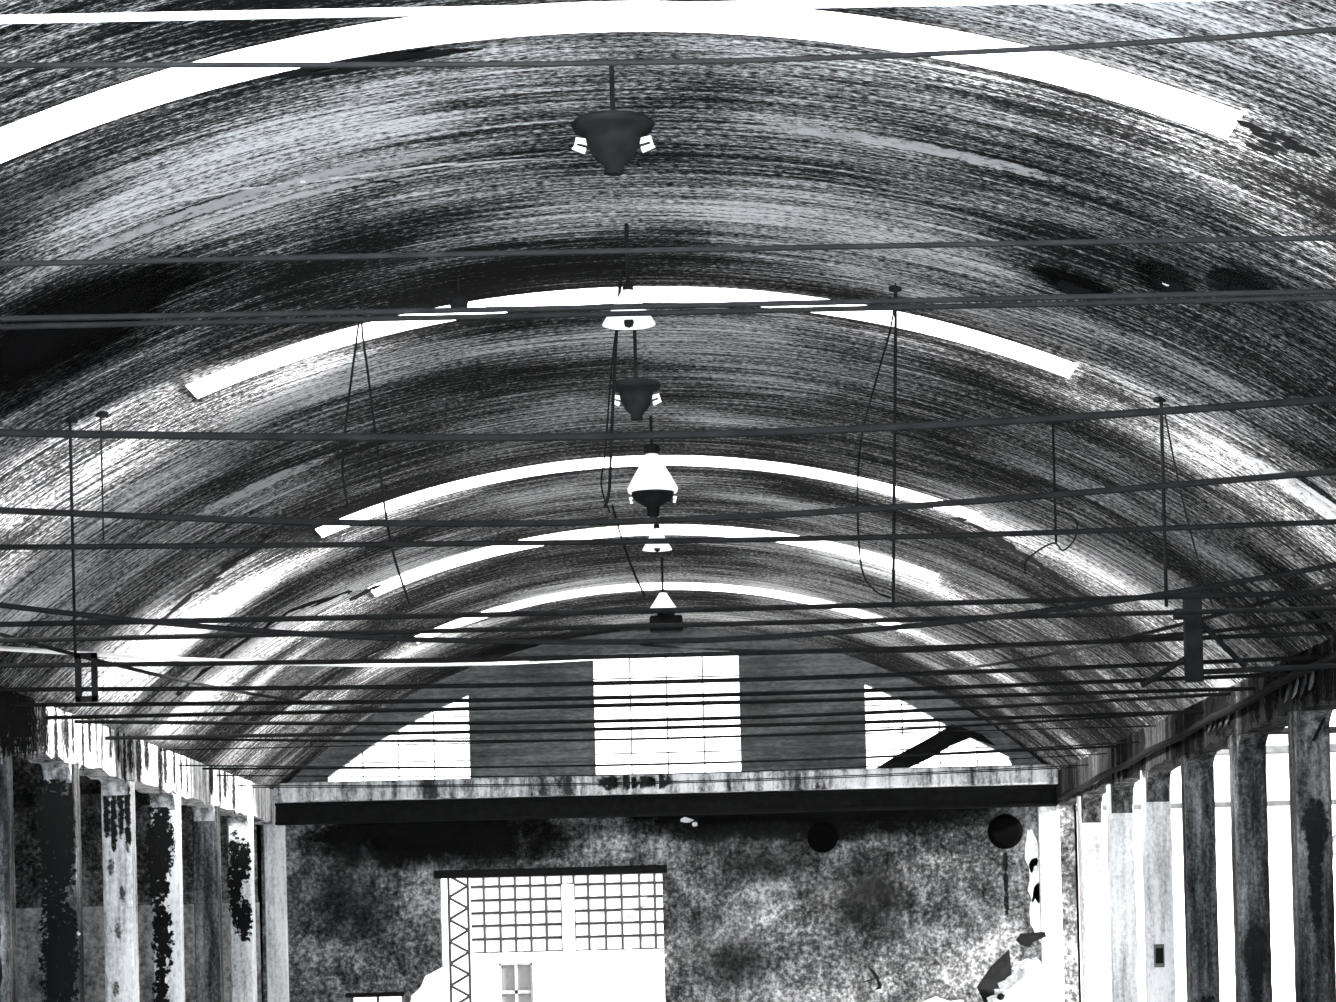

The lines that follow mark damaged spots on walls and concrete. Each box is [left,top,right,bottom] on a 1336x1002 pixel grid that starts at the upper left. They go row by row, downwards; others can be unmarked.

damp [1033,266,1111,300]
damp [1136,261,1192,292]
damp [1208,268,1269,305]